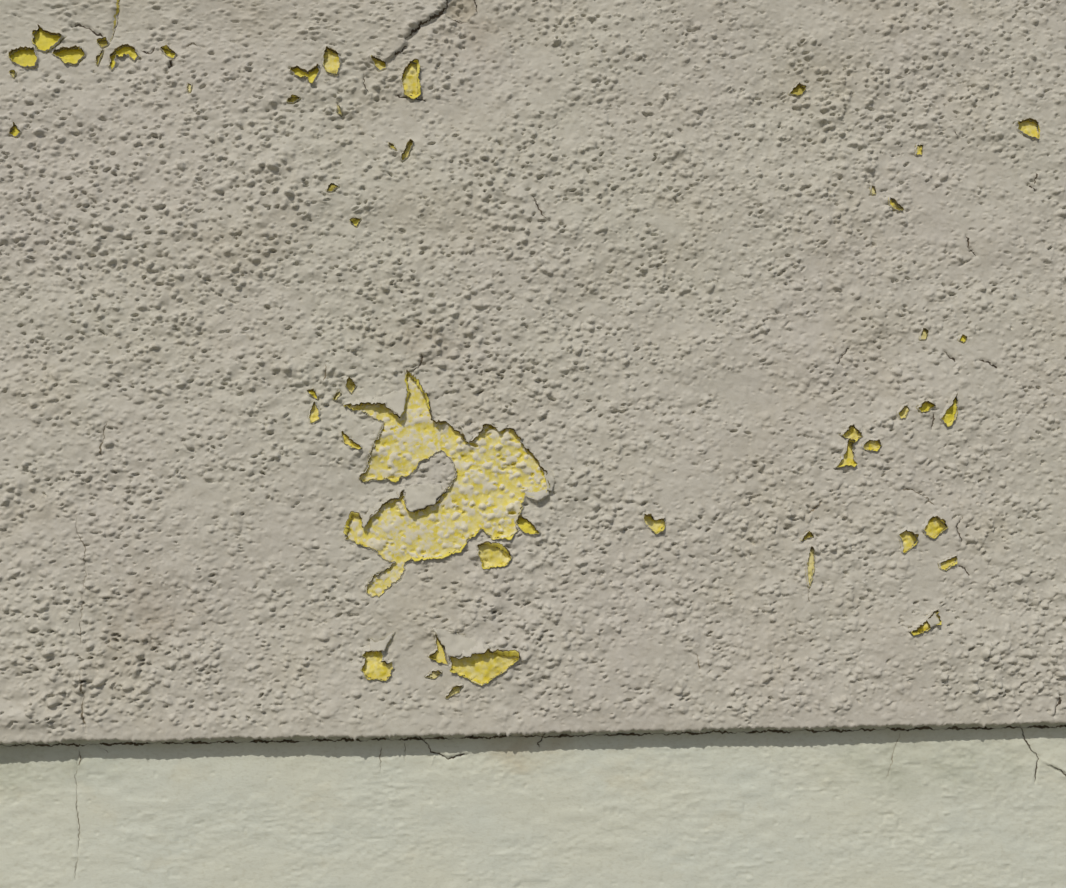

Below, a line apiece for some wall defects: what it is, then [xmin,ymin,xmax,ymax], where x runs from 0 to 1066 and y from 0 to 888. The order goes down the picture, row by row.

peeling [7,24,141,78]
peeling [289,46,343,83]
crack [394,0,478,55]
peeling [1014,118,1040,141]
peeling [897,391,959,427]
peeling [833,422,882,469]
peeling [333,370,555,598]
peeling [642,512,667,534]
peeling [896,514,948,554]
peeling [359,631,395,681]
peeling [425,628,521,699]
crack [1021,728,1066,779]